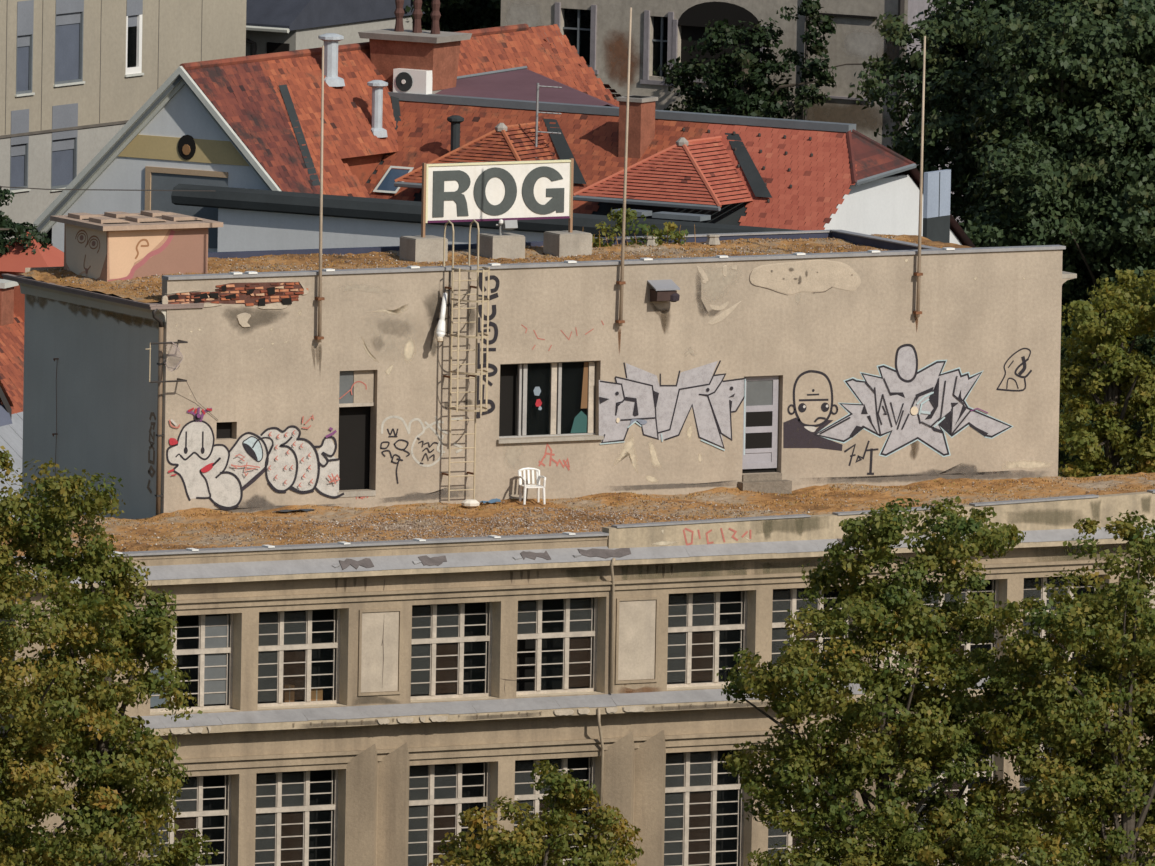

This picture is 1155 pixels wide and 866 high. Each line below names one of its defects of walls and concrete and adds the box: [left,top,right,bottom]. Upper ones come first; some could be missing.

spalling [162,282,309,314]